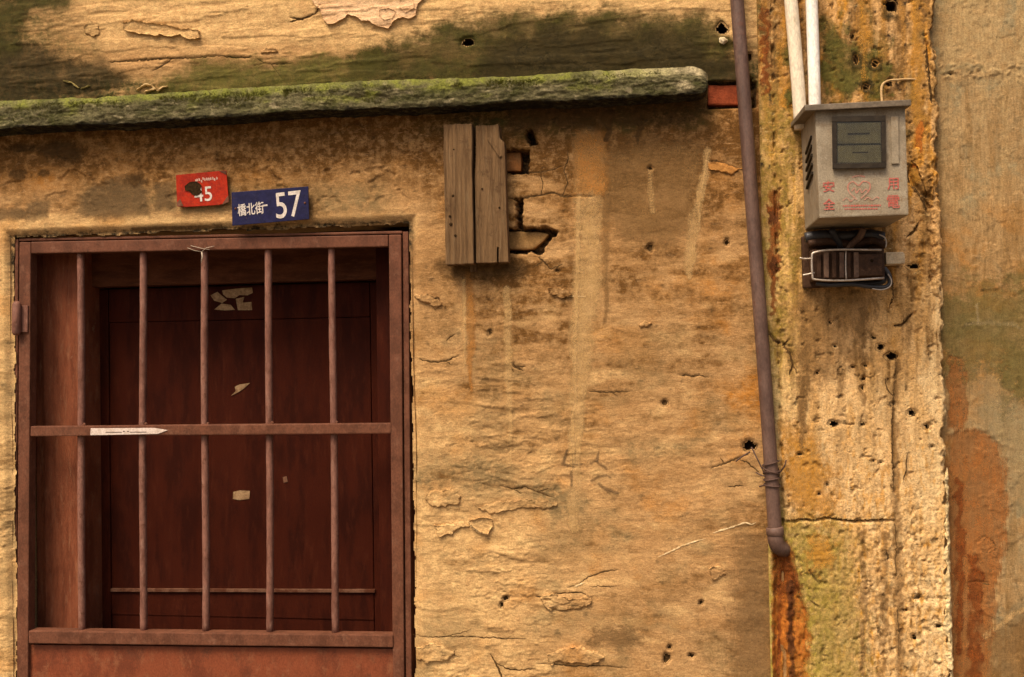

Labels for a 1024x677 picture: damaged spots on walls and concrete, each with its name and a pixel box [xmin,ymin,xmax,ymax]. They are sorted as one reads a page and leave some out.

damp [0,0,168,101]
flaking render [121,19,201,40]
peeling [312,0,423,29]
damp [475,21,736,85]
flaking render [507,152,523,173]
flaking render [509,232,549,251]
corrosion [766,190,781,316]
crack [885,359,908,492]
crack [786,513,898,579]
damp [881,530,901,562]
corrosion [771,541,812,677]
damp [880,578,903,656]